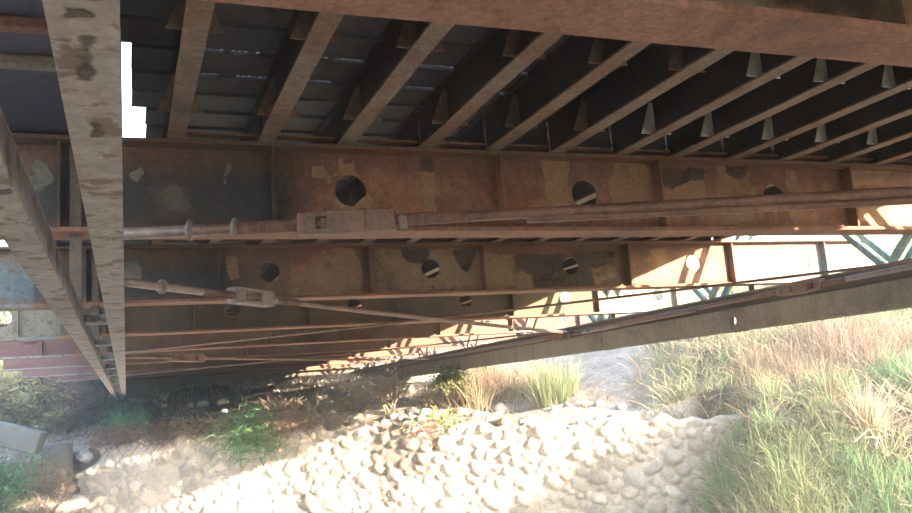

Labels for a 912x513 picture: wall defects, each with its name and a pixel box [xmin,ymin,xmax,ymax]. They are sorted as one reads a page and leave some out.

peeling [312,156,361,185]
peeling [540,160,571,206]
corrosion [661,167,705,189]
peeling [374,247,533,293]
corrosion [515,250,615,288]
damp [288,422,428,513]